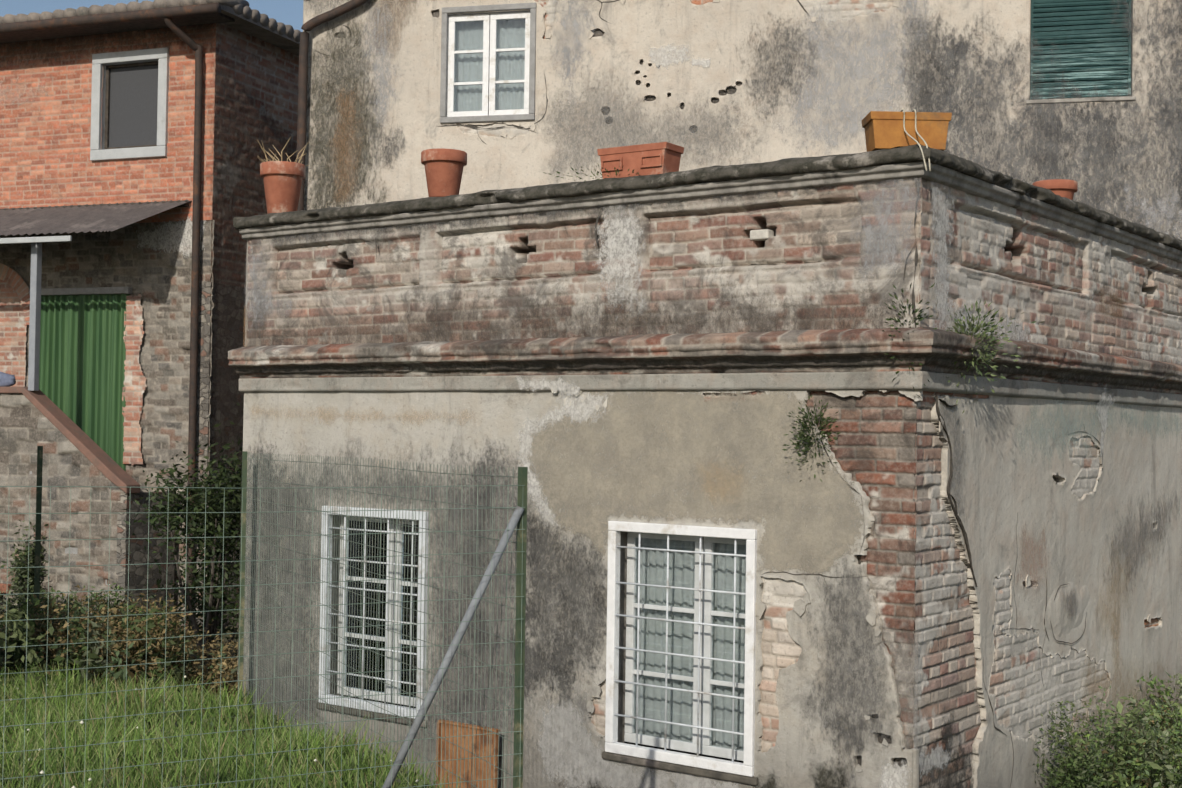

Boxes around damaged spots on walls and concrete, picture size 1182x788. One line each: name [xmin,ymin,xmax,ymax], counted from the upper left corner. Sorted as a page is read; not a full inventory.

leakage [312,0,408,209]
flaking render [636,60,685,109]
flaking render [711,82,742,104]
leakage [746,0,1182,240]
leakage [204,62,895,459]
peeling [516,377,608,422]
crack [936,396,977,587]
leakage [238,452,739,788]
flaking render [755,576,811,752]
flaking render [806,391,1112,788]
crack [1000,517,1049,686]